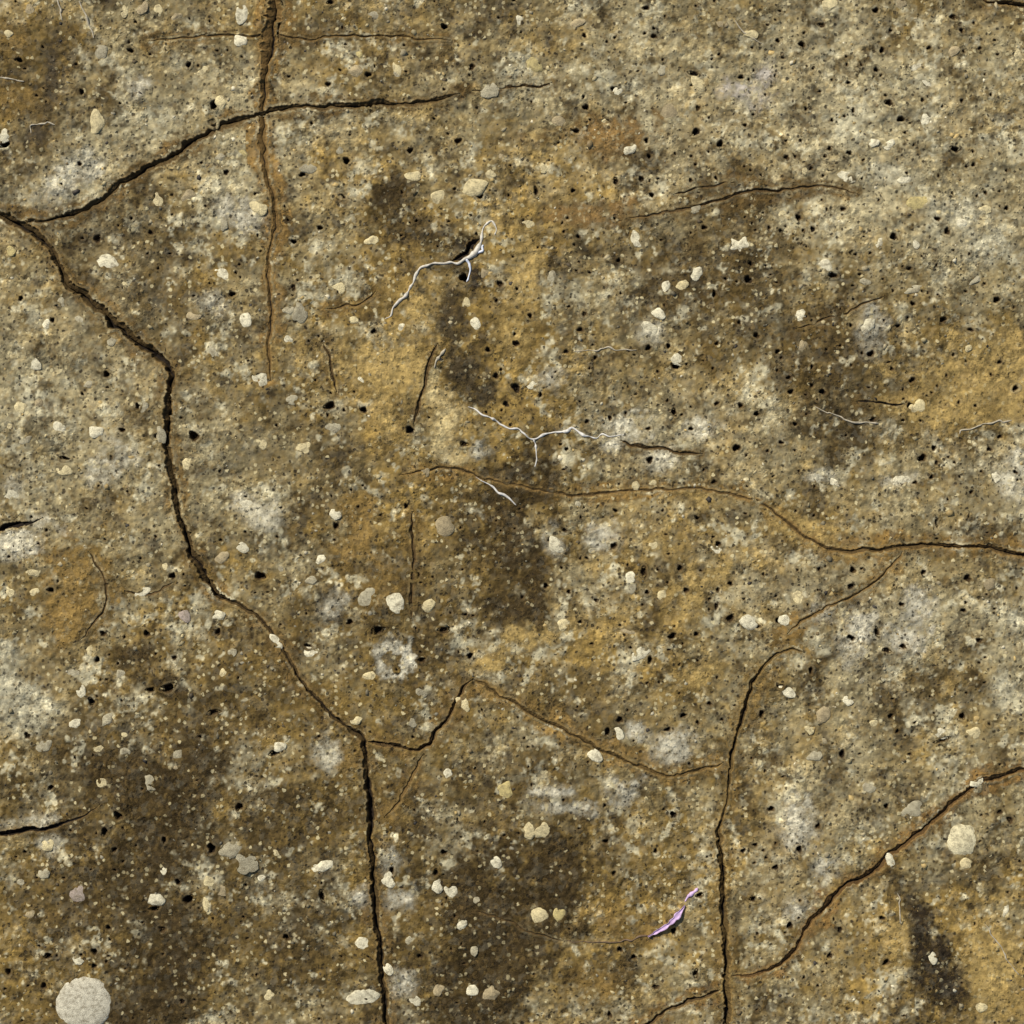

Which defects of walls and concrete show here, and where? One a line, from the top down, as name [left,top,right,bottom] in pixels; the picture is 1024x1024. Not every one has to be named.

crack [490,80,555,93]
crack [0,0,483,1024]
crack [399,460,1024,1024]